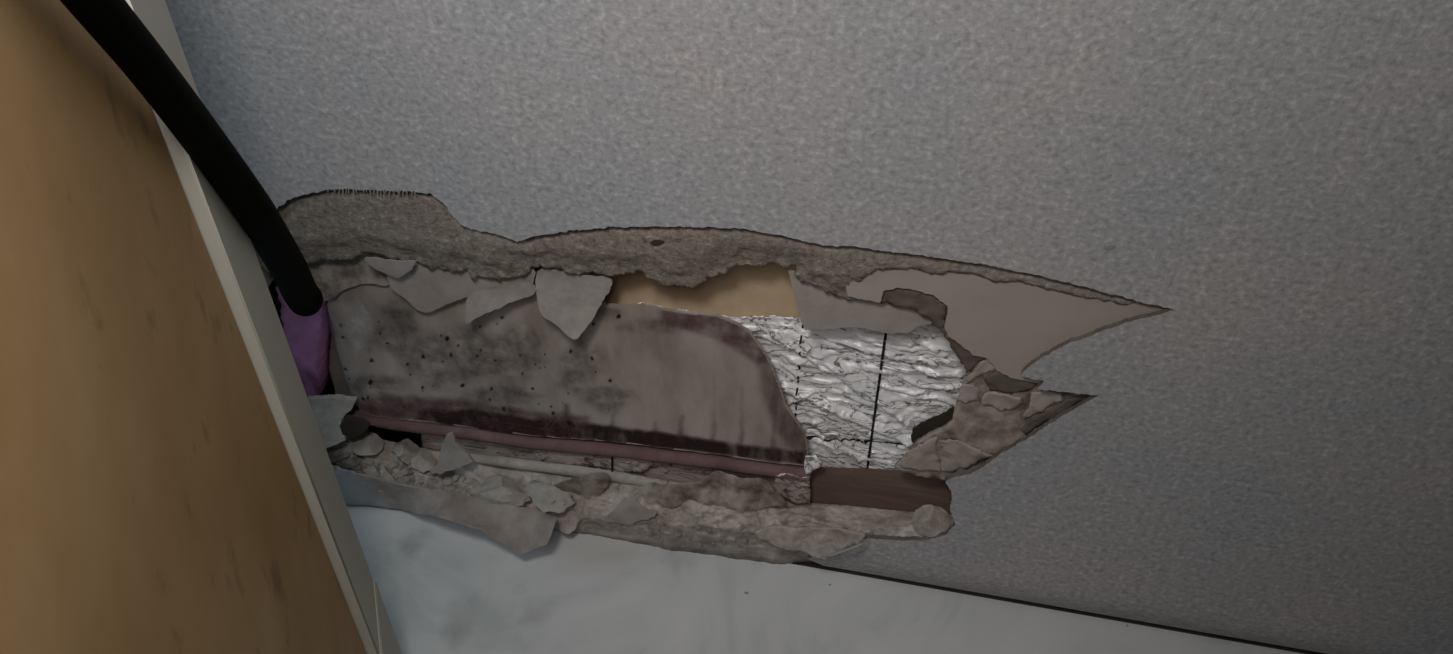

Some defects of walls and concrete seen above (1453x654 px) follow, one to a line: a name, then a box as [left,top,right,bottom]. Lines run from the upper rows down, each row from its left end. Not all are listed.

leakage [664,311,766,362]
spalling [277,188,1164,435]
leakage [344,349,807,464]
spalling [326,415,925,564]
peeling [940,439,992,473]